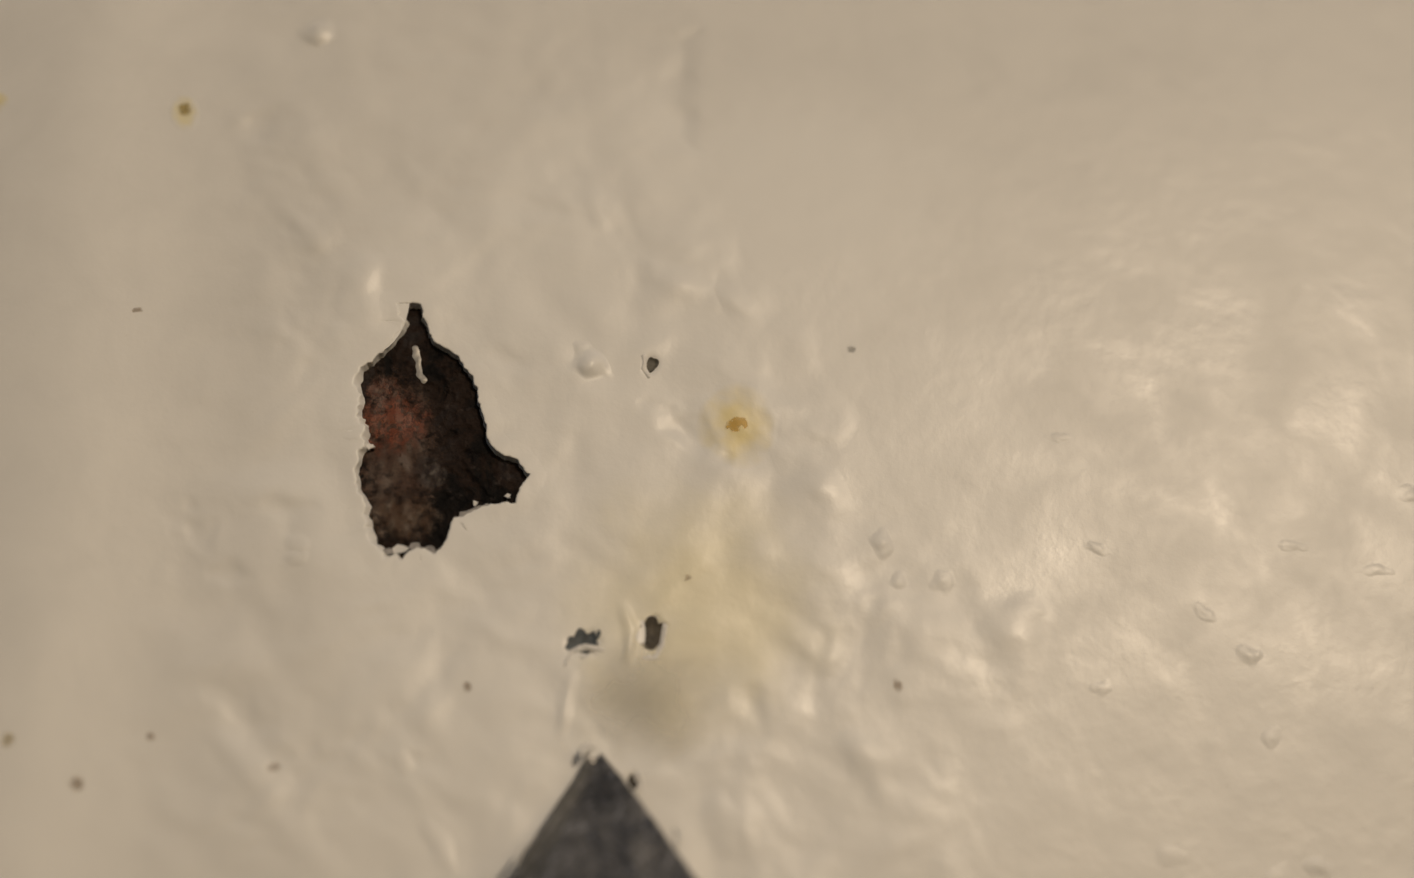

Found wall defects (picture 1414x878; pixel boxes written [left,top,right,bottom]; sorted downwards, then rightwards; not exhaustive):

corrosion [170,94,200,132]
peeling [335,287,548,578]
corrosion [539,381,860,765]
peeling [564,628,604,667]
peeling [640,616,667,660]